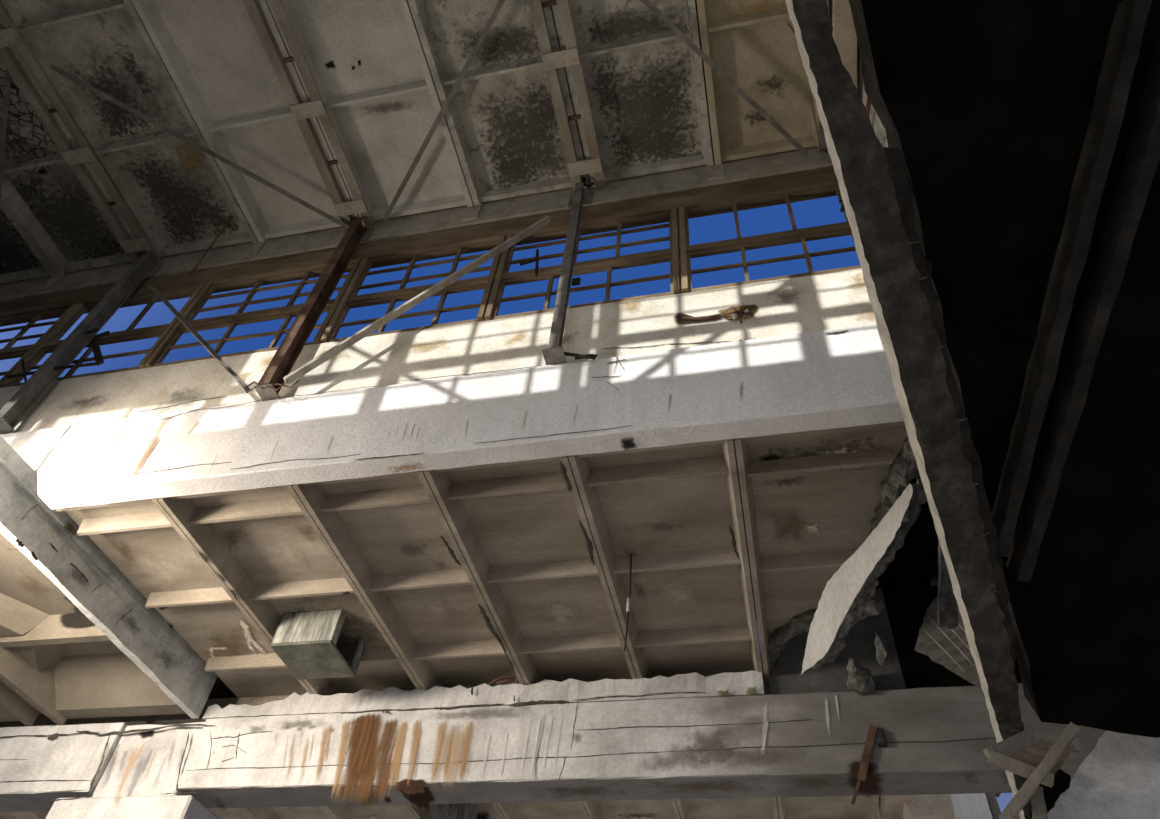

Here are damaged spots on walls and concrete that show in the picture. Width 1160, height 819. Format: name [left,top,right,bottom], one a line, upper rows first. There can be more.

mould [76,51,151,143]
mould [479,84,567,187]
mould [592,53,700,165]
damp [133,154,239,243]
spalling [870,437,920,533]
crack [440,536,461,566]
spalling [760,609,817,675]
crack [345,604,996,781]
crack [0,724,348,802]
rust [317,714,421,807]
rust [432,722,471,780]
rust [849,761,881,796]